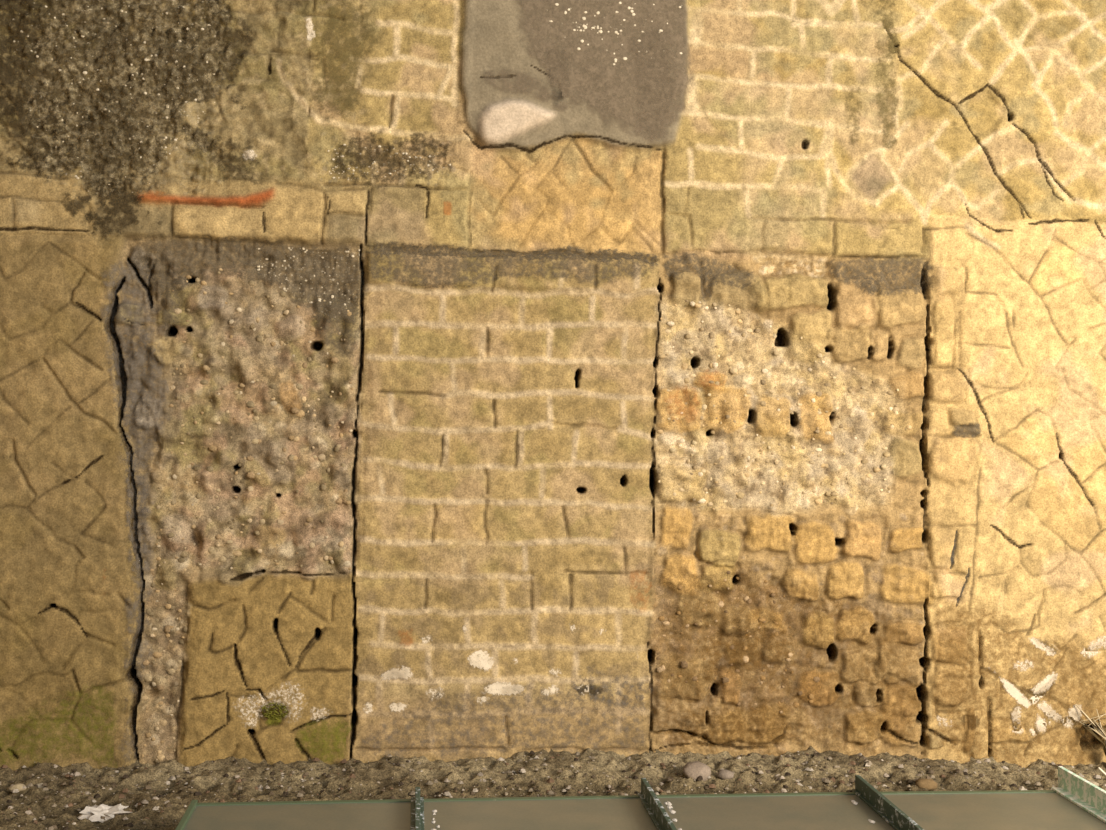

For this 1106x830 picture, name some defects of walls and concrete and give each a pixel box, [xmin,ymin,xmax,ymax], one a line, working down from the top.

leakage [0,0,259,237]
leakage [328,133,451,185]
leakage [488,0,692,141]
crack [889,34,1105,237]
crack [62,259,156,760]
spalling [135,267,361,764]
crack [231,191,370,760]
leakage [103,235,751,677]
crack [649,278,662,533]
spalling [657,297,912,518]
spalling [654,570,825,716]
crack [881,599,955,754]